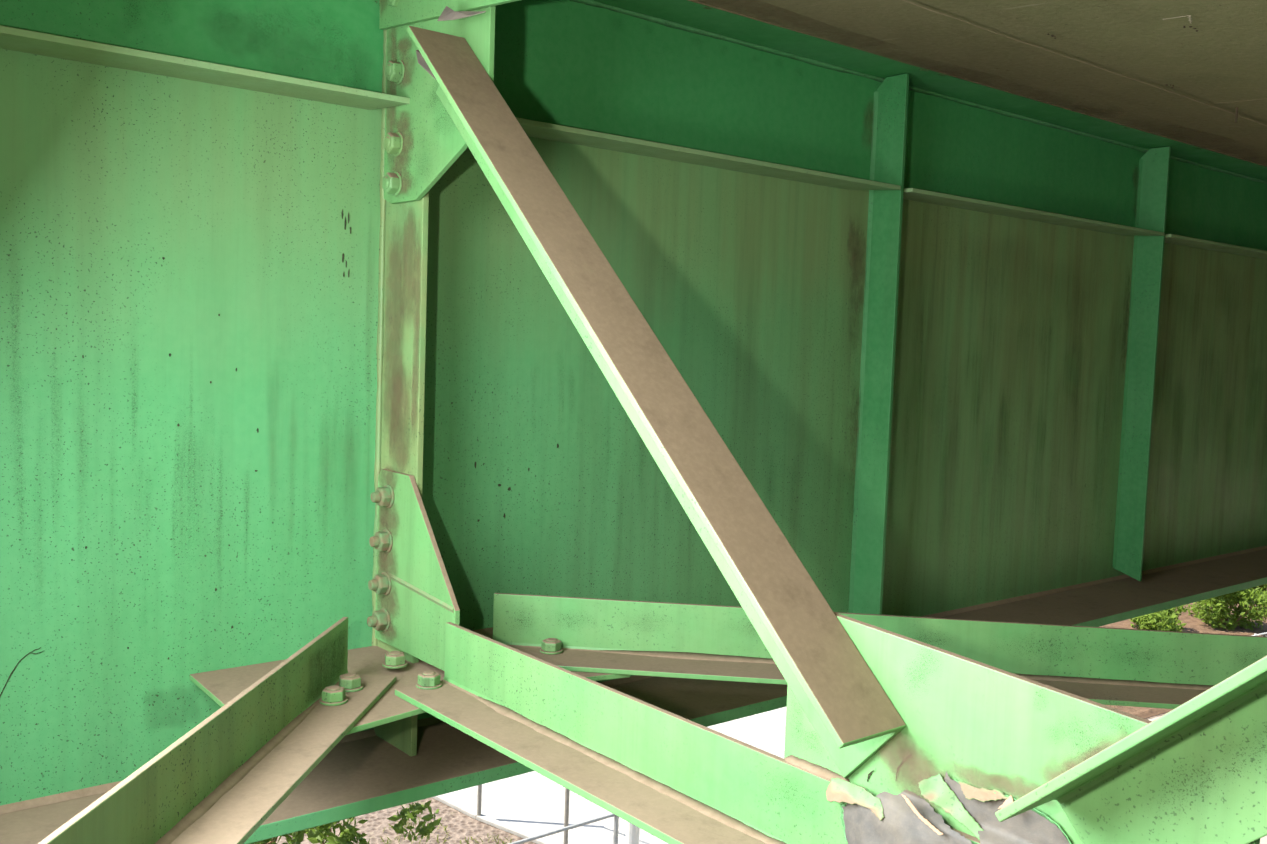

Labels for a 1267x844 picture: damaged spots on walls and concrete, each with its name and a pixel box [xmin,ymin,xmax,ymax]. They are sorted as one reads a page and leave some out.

crack [0,647,43,696]
corrosion [1050,744,1111,780]
peeling [826,771,1072,844]